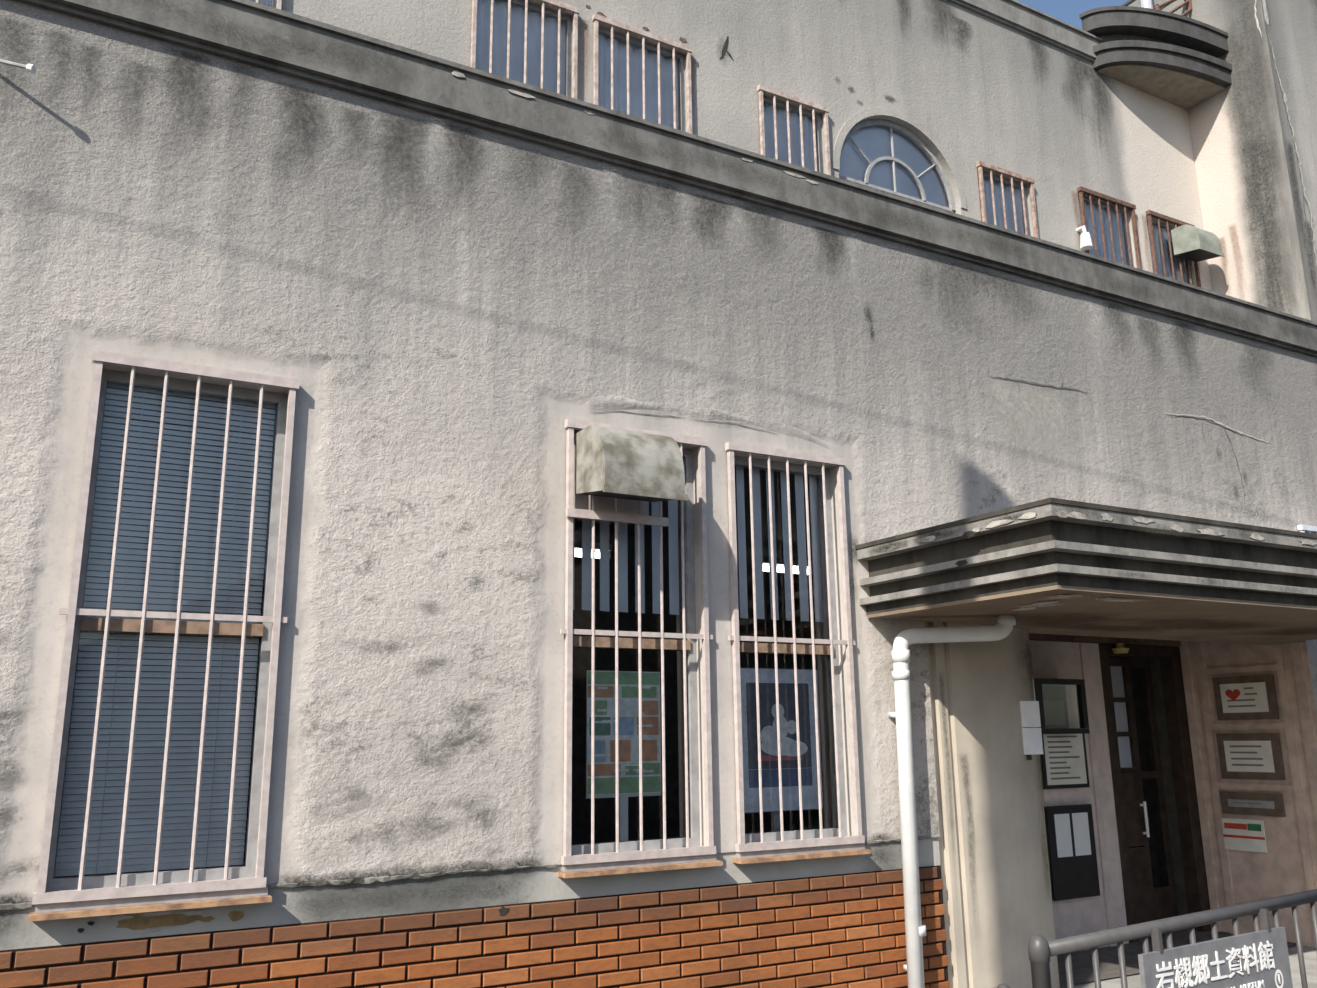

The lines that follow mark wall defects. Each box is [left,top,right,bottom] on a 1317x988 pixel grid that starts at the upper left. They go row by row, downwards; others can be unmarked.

damp [1289,147,1315,273]
crack [990,376,1087,399]
crack [1165,413,1273,505]
peeling [113,910,244,933]